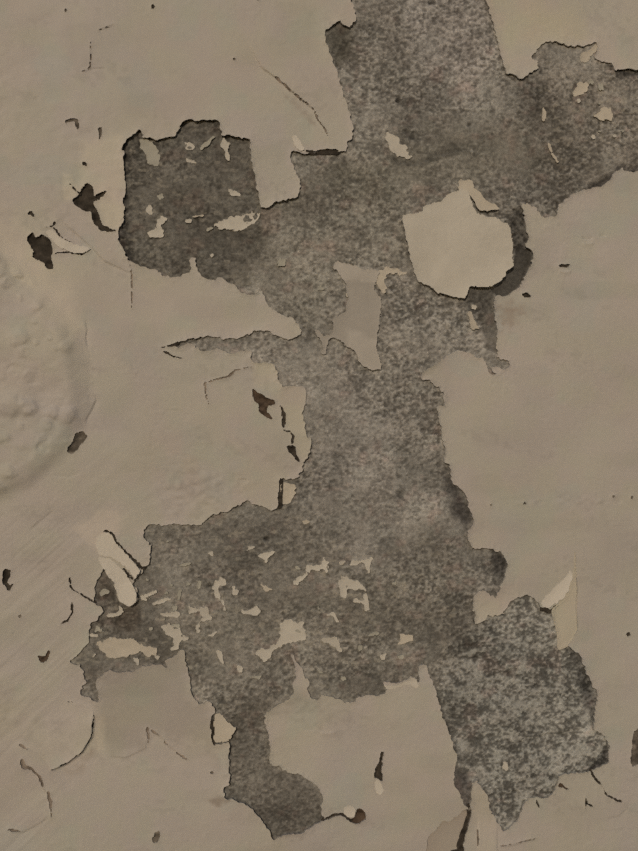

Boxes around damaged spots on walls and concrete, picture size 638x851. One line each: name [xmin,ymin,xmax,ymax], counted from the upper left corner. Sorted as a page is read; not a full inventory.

crack [274,77,341,155]
peeling [72,183,116,232]
peeling [27,230,90,269]
peeling [401,188,514,298]
peeling [252,389,286,428]
peeling [67,431,87,454]
peeling [99,557,137,606]
peeling [293,557,329,585]
peeling [255,619,306,662]
spalling [436,595,609,830]
crack [19,715,94,816]
crack [451,803,479,851]